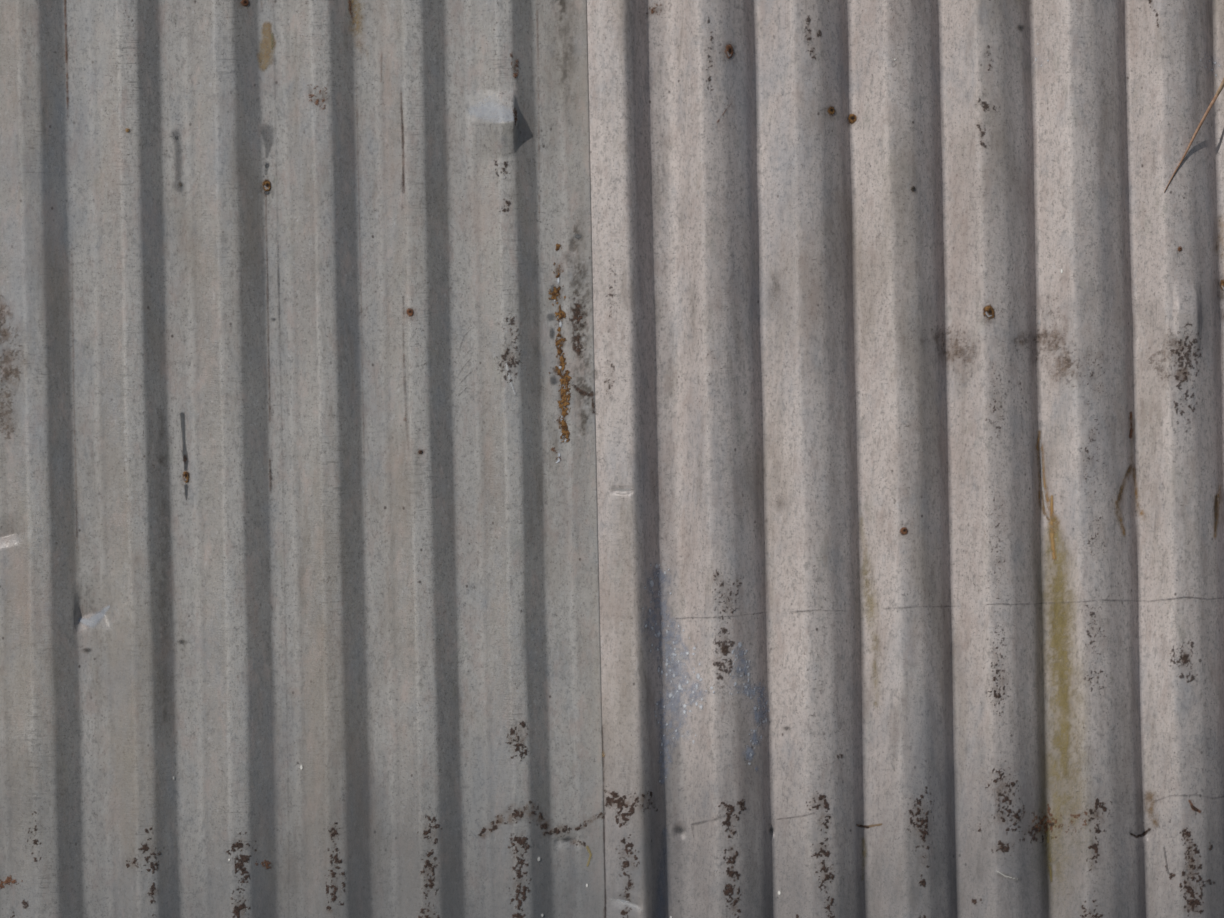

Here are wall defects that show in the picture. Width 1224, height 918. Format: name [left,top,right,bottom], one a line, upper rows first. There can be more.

corrosion [548,243,571,463]
corrosion [1170,324,1201,415]
corrosion [479,564,770,918]
corrosion [126,828,161,916]
corrosion [226,832,271,918]
corrosion [326,822,345,910]
corrosion [807,791,834,918]
corrosion [909,787,932,849]
corrosion [1165,829,1215,914]